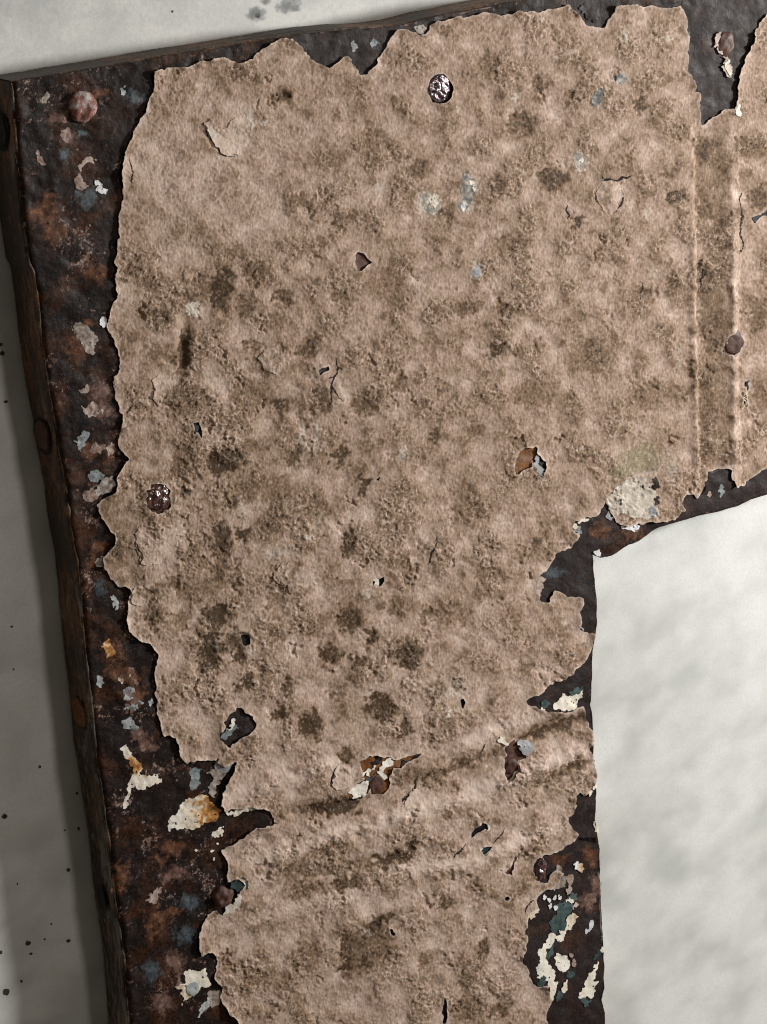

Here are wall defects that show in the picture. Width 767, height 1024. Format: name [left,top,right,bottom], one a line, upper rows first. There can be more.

peeling [681,0,767,125]
rust [28,189,66,244]
crack [595,175,632,213]
peeling [677,469,767,520]
peeling [14,60,275,1024]
peeling [537,477,660,633]
rust [97,625,148,709]
peeling [526,652,591,729]
rust [130,726,158,752]
rust [154,840,186,885]
rust [144,906,184,943]
peeling [523,784,605,1024]